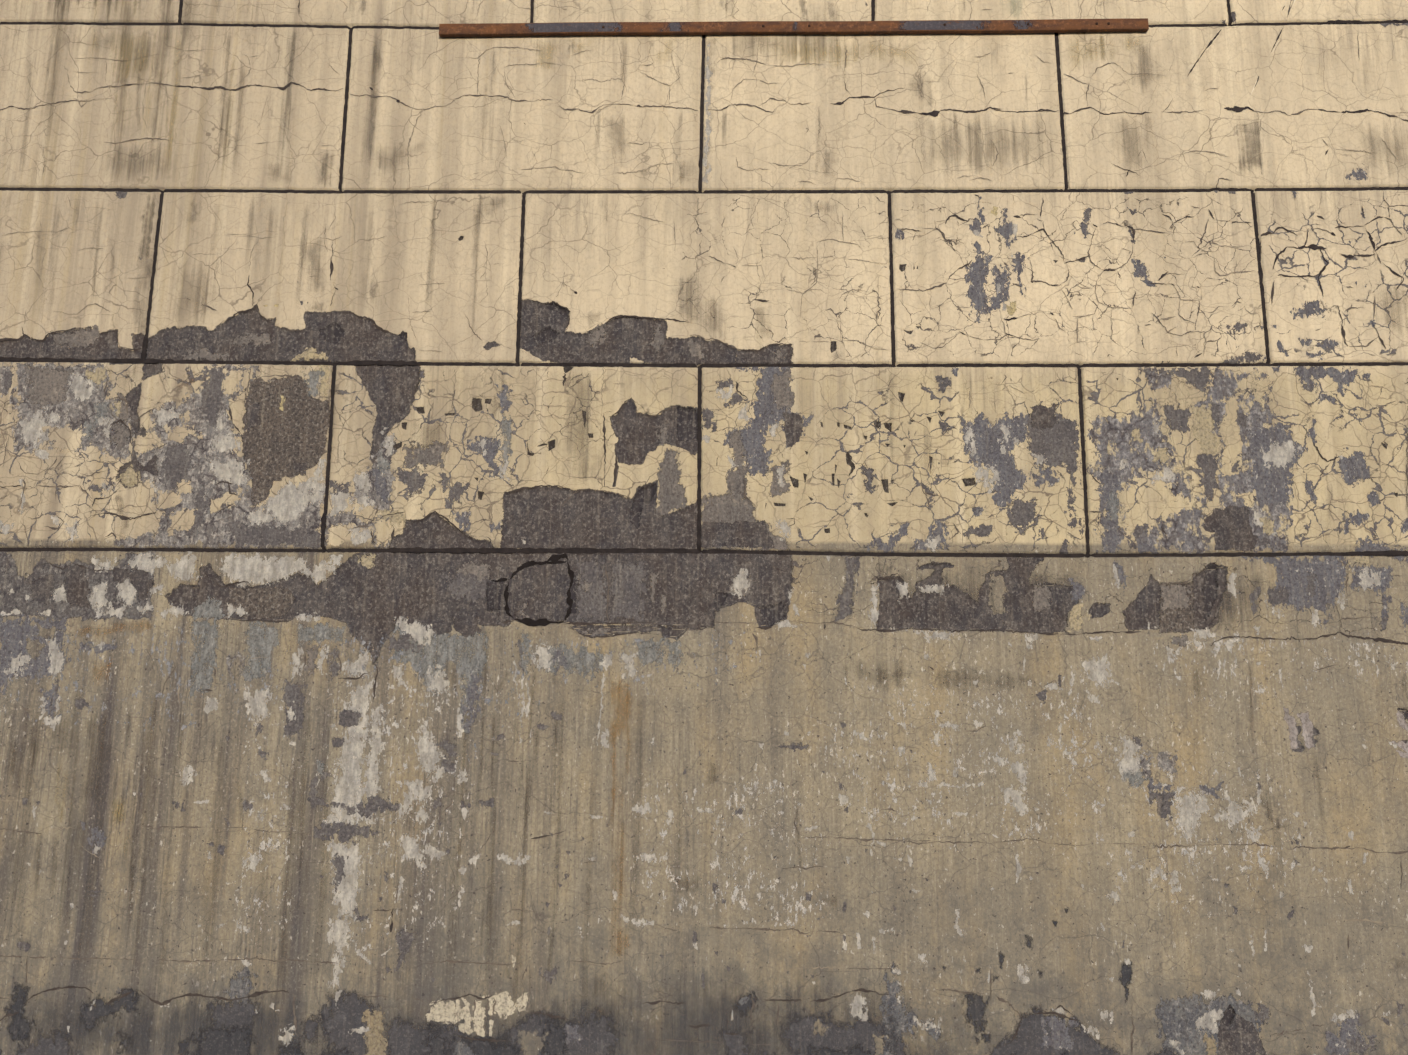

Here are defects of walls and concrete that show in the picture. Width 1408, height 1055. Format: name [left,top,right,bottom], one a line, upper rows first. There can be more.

peeling [1290,249,1329,320]
crack [0,29,1408,742]
flaking render [0,299,906,773]
peeling [833,322,1408,633]
water stain [1146,591,1408,706]
water stain [629,743,831,935]
water stain [807,633,1312,915]
peeling [426,991,530,1037]
water stain [637,910,913,1055]
water stain [991,1006,1119,1055]
peeling [1150,992,1271,1055]
peeling [1324,1001,1408,1055]